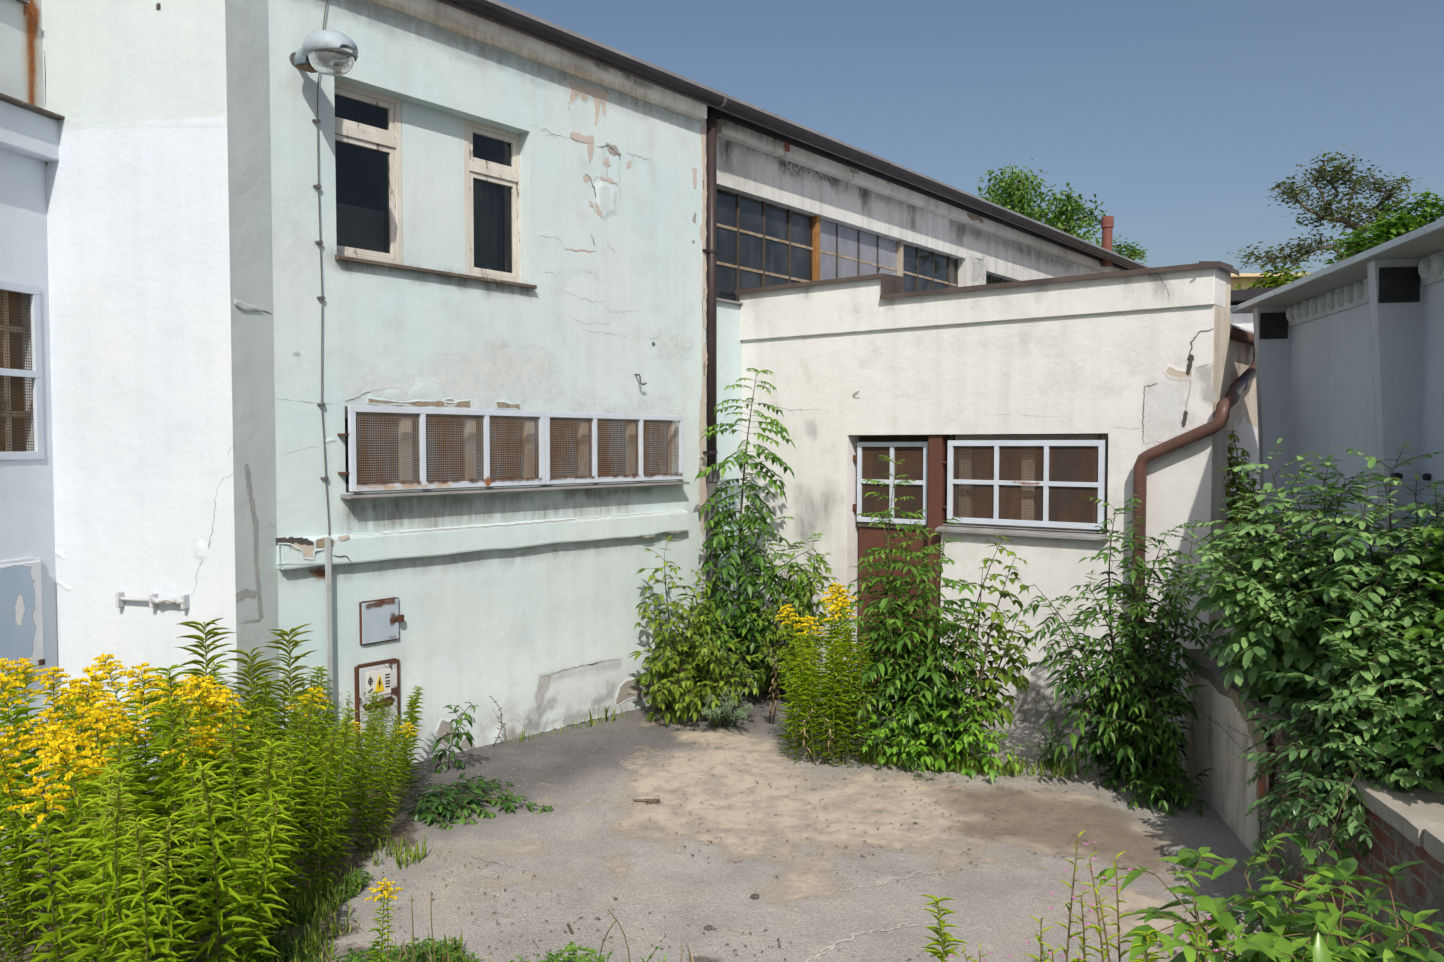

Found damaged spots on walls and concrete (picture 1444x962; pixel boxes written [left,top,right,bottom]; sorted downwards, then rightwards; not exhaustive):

rust [24,0,38,105]
peeling [541,79,648,221]
flaking render [367,397,473,409]
flaking render [495,400,522,411]
flaking render [276,535,352,566]
peeling [536,659,618,708]
flaking render [614,677,663,707]
crack [805,921,938,962]